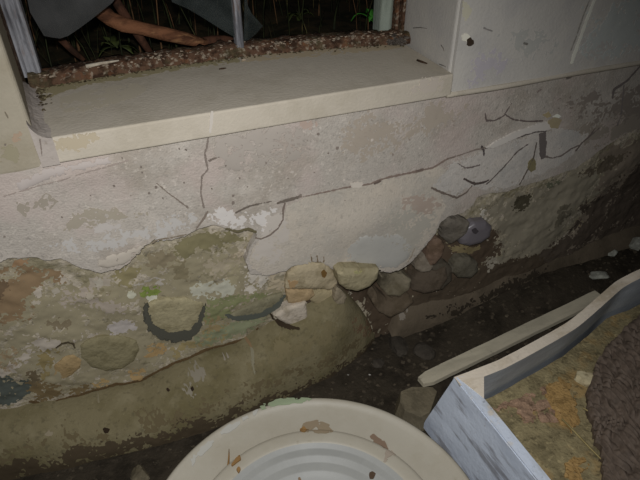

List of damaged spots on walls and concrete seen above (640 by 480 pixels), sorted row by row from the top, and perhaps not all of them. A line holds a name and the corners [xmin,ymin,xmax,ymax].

crack [612,66,640,126]
spalling [0,240,287,409]
crack [152,137,219,244]
spalling [337,281,392,338]
crack [225,103,600,240]
leakage [399,163,640,320]